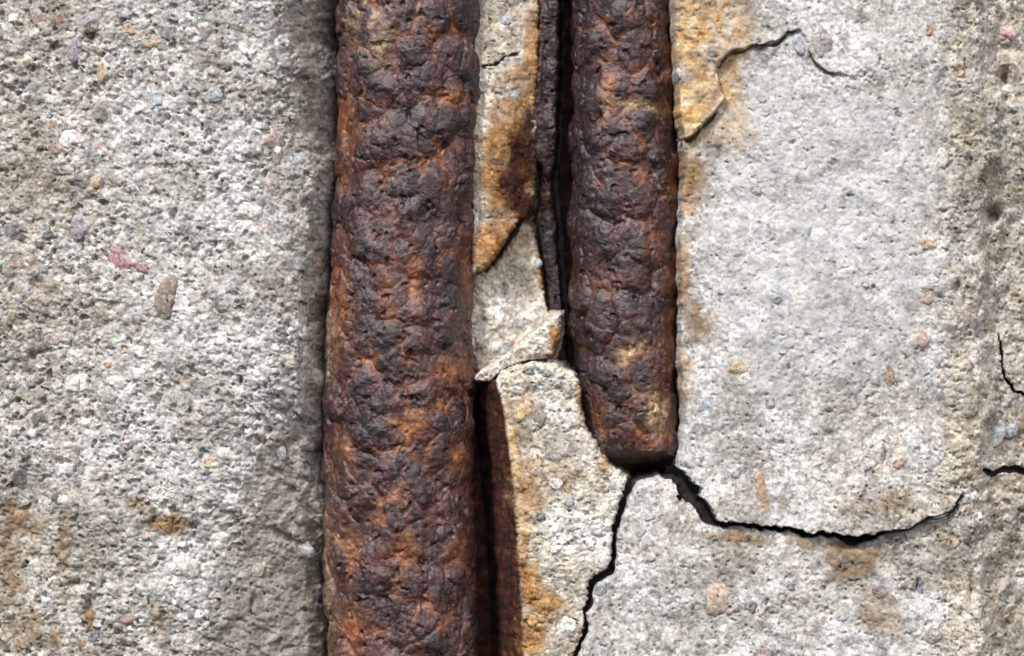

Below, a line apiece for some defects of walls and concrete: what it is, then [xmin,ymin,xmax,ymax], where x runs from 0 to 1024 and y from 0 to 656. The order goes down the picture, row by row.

spalling [215,0,481,656]
corrosion [473,9,539,271]
corrosion [549,325,559,349]
spalling [566,0,716,472]
spalling [714,31,796,73]
spalling [721,72,915,391]
corrosion [472,378,560,656]
crack [556,477,636,656]
crack [664,465,963,546]